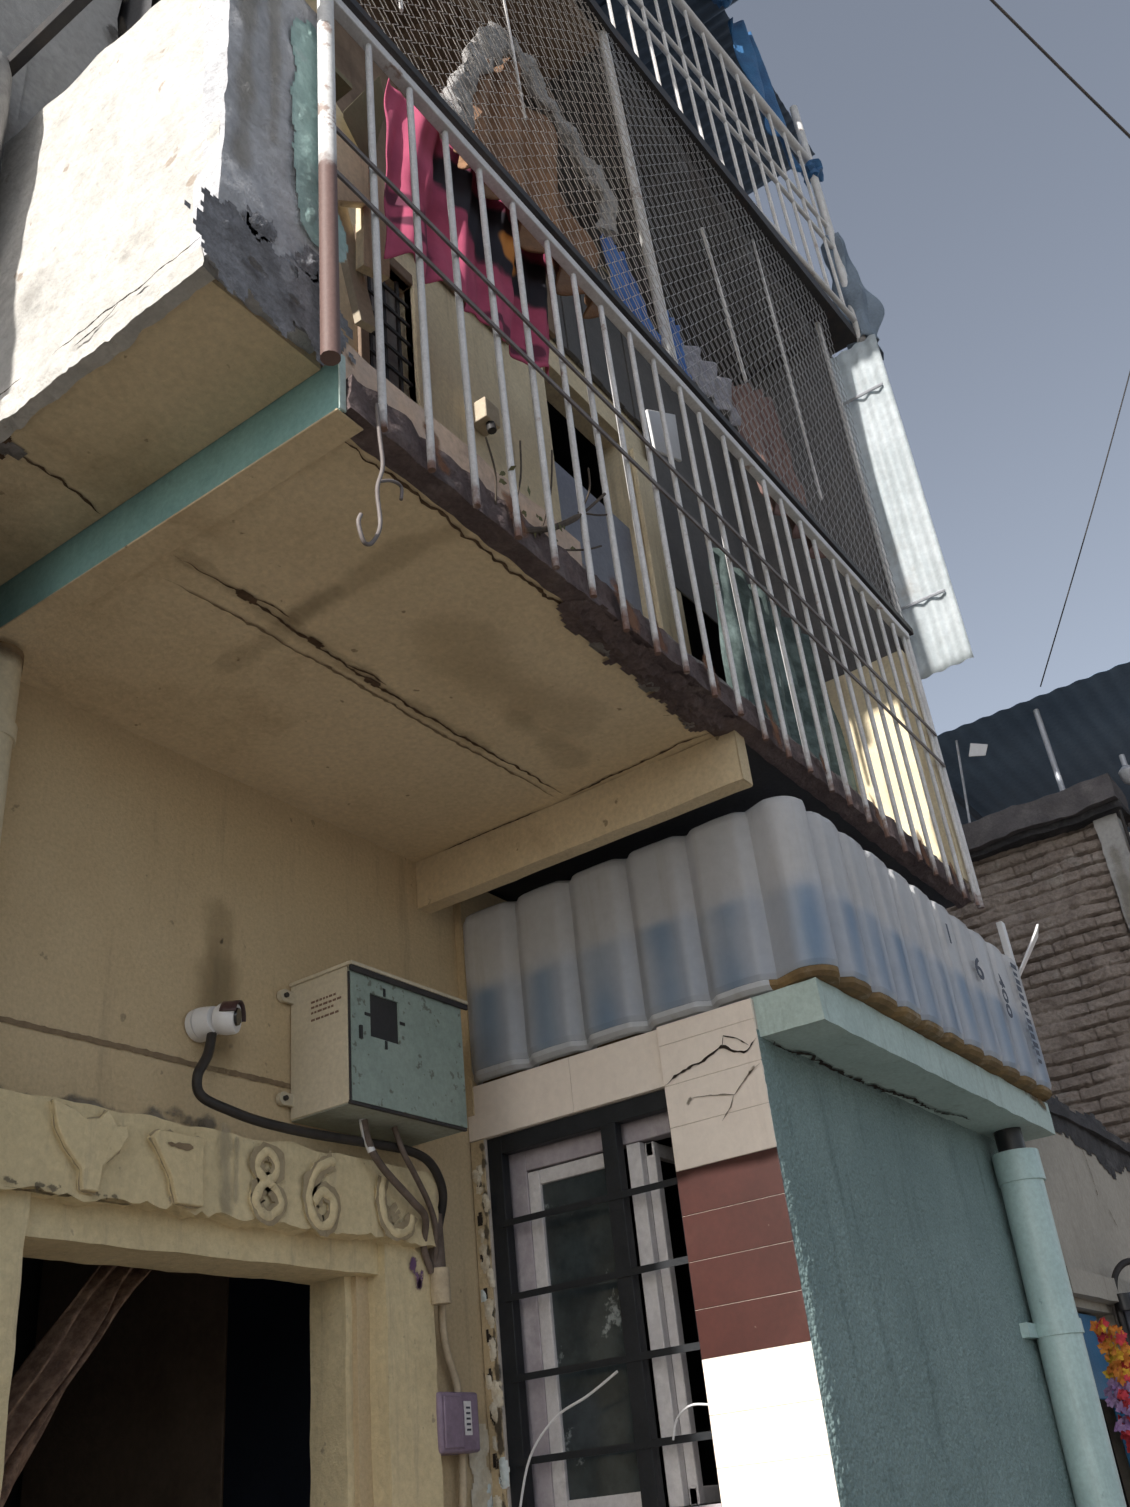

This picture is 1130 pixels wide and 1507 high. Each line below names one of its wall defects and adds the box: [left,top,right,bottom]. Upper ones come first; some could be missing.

spalling [184,17,327,366]
peeling [338,215,348,263]
crack [56,238,199,351]
crack [0,436,100,514]
spalling [423,423,450,475]
spalling [502,491,526,536]
spalling [556,580,740,737]
crack [163,558,709,850]
spalling [916,832,930,866]
crack [670,1035,969,1121]
peeling [469,1143,510,1507]